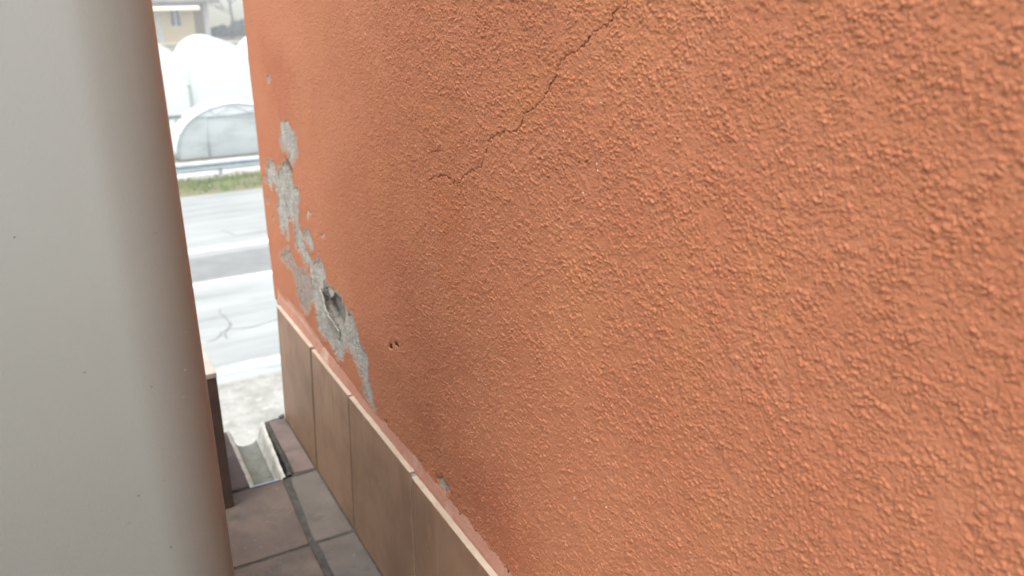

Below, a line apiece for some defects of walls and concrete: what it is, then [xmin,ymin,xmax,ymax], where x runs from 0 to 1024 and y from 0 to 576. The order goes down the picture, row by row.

crack [426,0,628,228]
flaking render [263,119,387,423]